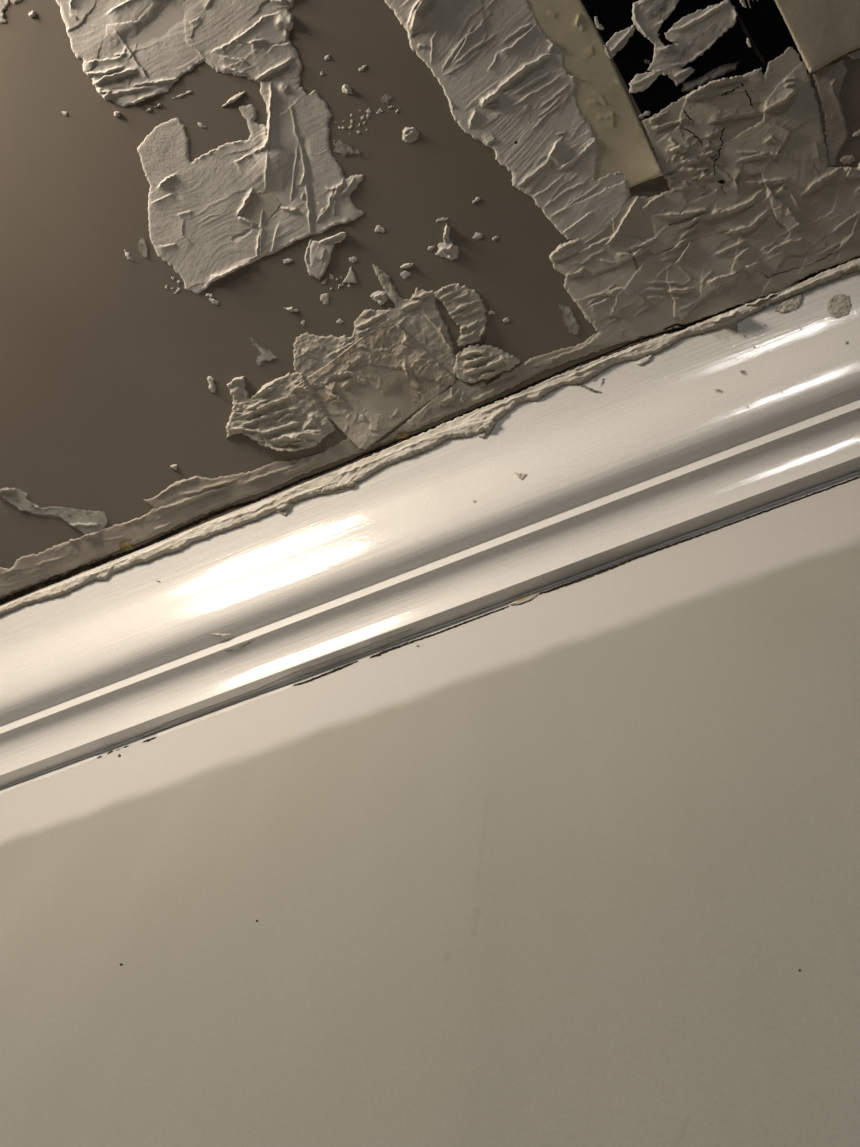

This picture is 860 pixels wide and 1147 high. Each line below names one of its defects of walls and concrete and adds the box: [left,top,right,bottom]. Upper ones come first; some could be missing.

peeling [343,267,357,283]
peeling [840,262,860,280]
crack [0,253,860,605]
peeling [475,420,497,438]
peeling [320,481,359,494]
peeling [276,503,294,516]
peeling [508,592,541,606]